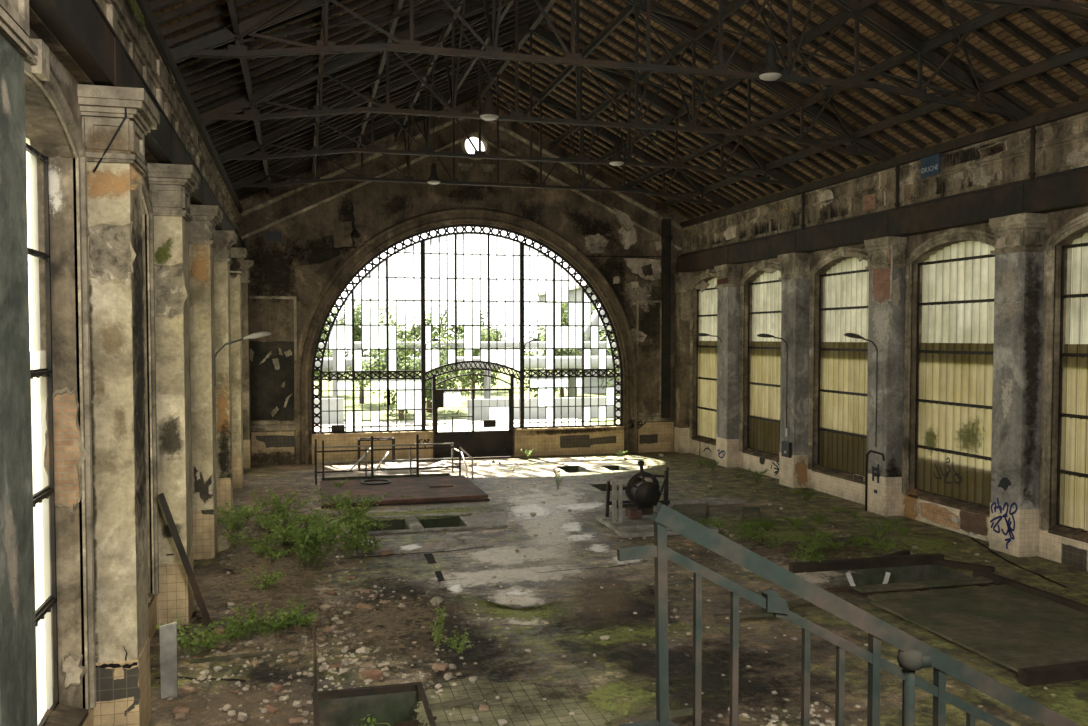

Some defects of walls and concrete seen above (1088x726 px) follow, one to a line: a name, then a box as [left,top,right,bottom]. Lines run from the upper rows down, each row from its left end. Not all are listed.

flaking render [858,246,901,308]
flaking render [44,387,87,512]
leakage [159,418,181,454]
flaking render [192,465,215,515]
peeling [59,651,140,716]